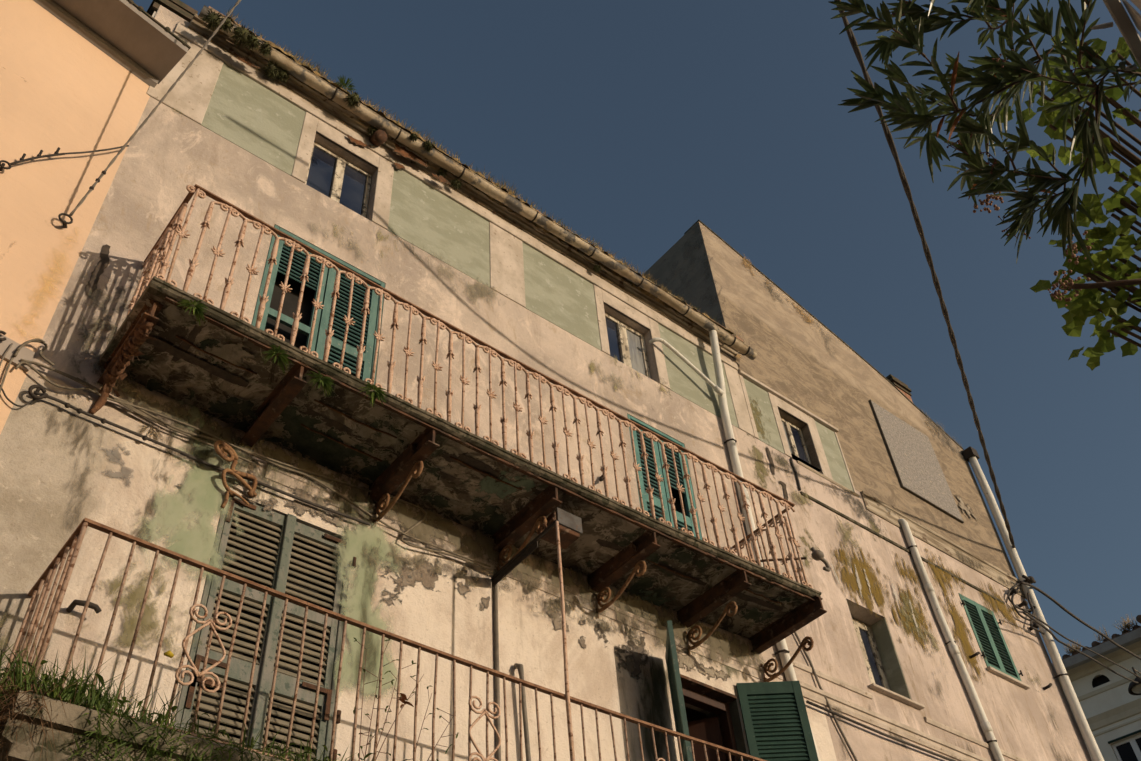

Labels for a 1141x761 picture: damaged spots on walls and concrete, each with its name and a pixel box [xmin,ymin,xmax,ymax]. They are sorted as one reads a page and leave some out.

peeling [141,296,266,372]
leakage [134,500,157,542]
peeling [125,356,490,697]
flaking render [544,606,654,684]